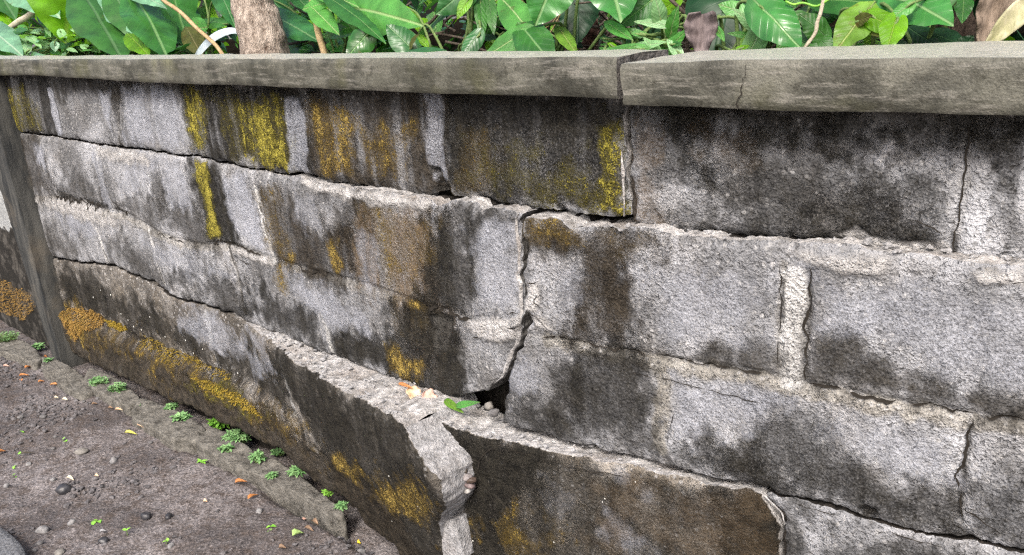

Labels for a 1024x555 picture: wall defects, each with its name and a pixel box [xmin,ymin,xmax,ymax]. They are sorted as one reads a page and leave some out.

leakage [667,106,864,163]
leakage [936,115,991,150]
leakage [224,173,263,246]
crack [915,128,970,251]
leakage [697,341,766,372]
crack [477,208,1024,534]
leakage [809,328,1024,427]